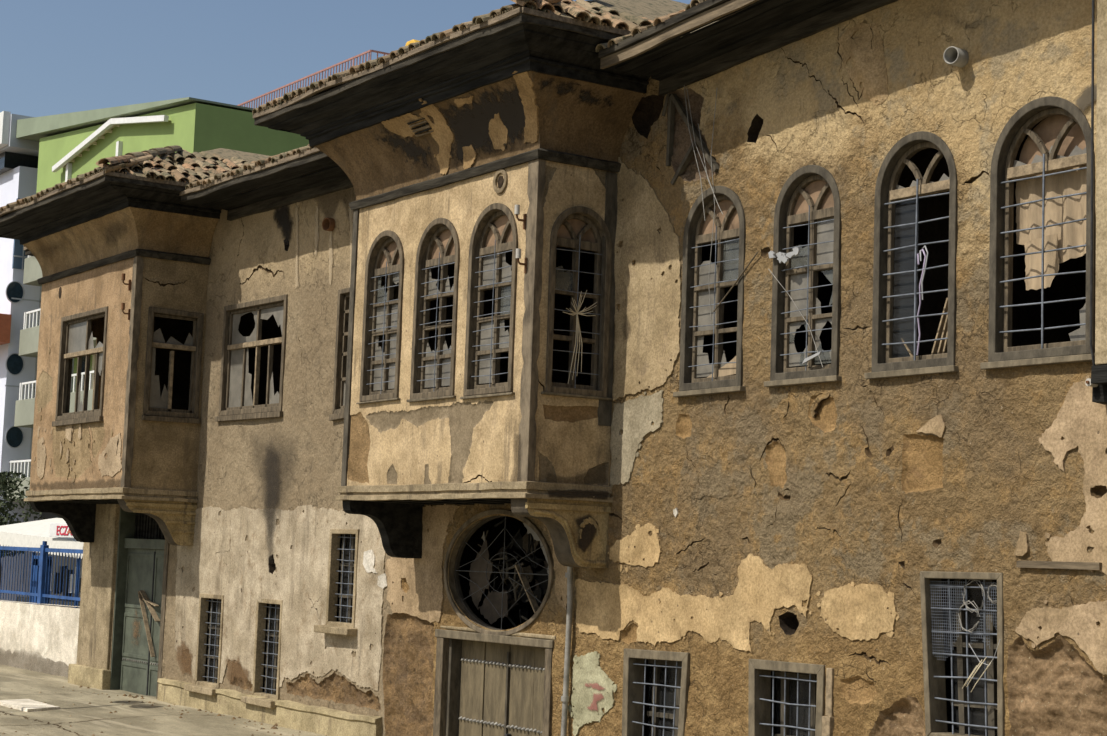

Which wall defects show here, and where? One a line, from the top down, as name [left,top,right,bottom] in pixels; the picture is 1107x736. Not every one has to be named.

peeling [382,98,477,175]
peeling [489,113,508,151]
peeling [512,71,539,144]
crack [781,28,890,149]
crack [240,262,285,285]
peeling [584,157,682,489]
spalling [347,400,494,484]
spalling [886,414,946,494]
peeling [1039,375,1107,575]
peeling [175,504,460,736]
peeling [541,521,900,736]
spalling [1006,600,1107,736]